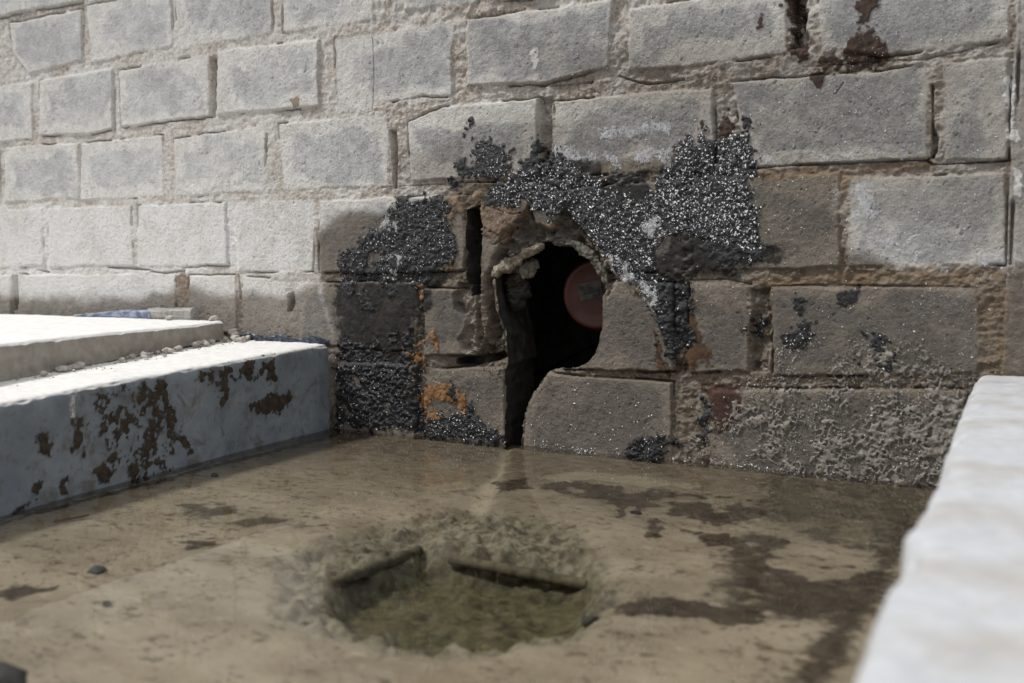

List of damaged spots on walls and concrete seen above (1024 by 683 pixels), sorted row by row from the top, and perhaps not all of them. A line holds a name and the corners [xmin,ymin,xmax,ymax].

corrosion [397,329,466,428]
spalling [443,188,624,449]
damp [492,472,896,625]